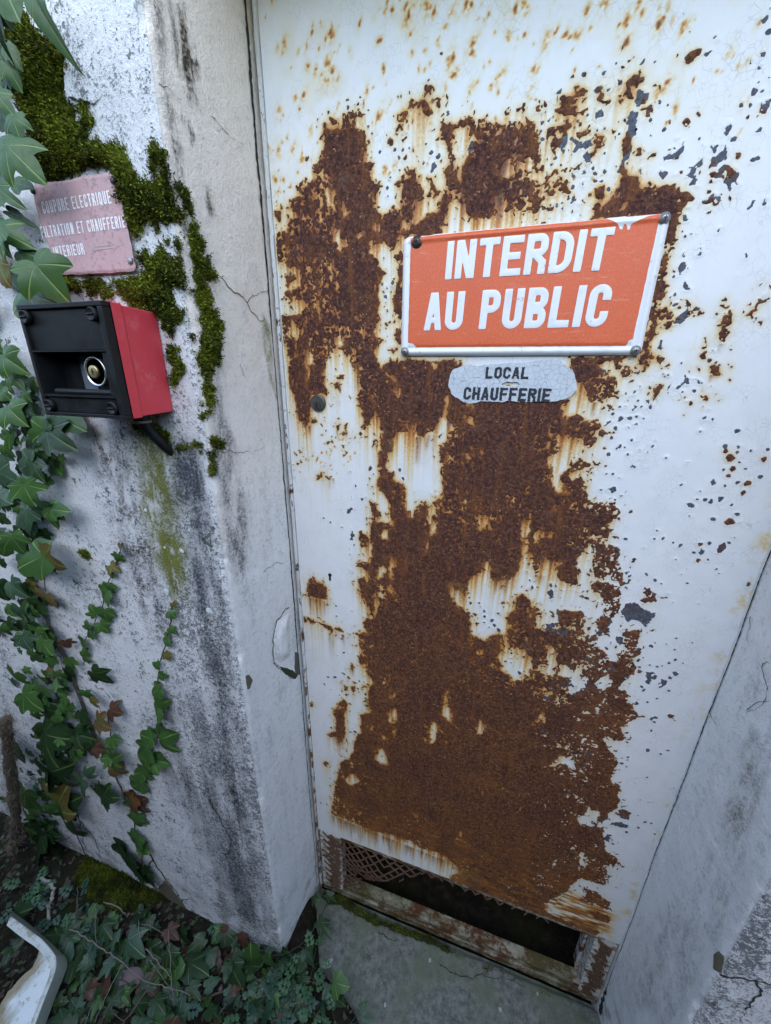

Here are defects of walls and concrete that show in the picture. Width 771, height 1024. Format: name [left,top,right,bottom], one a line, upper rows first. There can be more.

water stain [173,17,198,97]
corrosion [555,85,588,117]
peeling [494,45,760,238]
peeling [677,36,717,64]
peeling [739,52,771,132]
water stain [94,425,228,706]
water stain [217,424,247,562]
flaking render [273,607,300,679]
corrosion [276,108,695,935]
peeling [579,552,684,705]
peeling [653,530,735,574]
crack [599,550,771,1016]